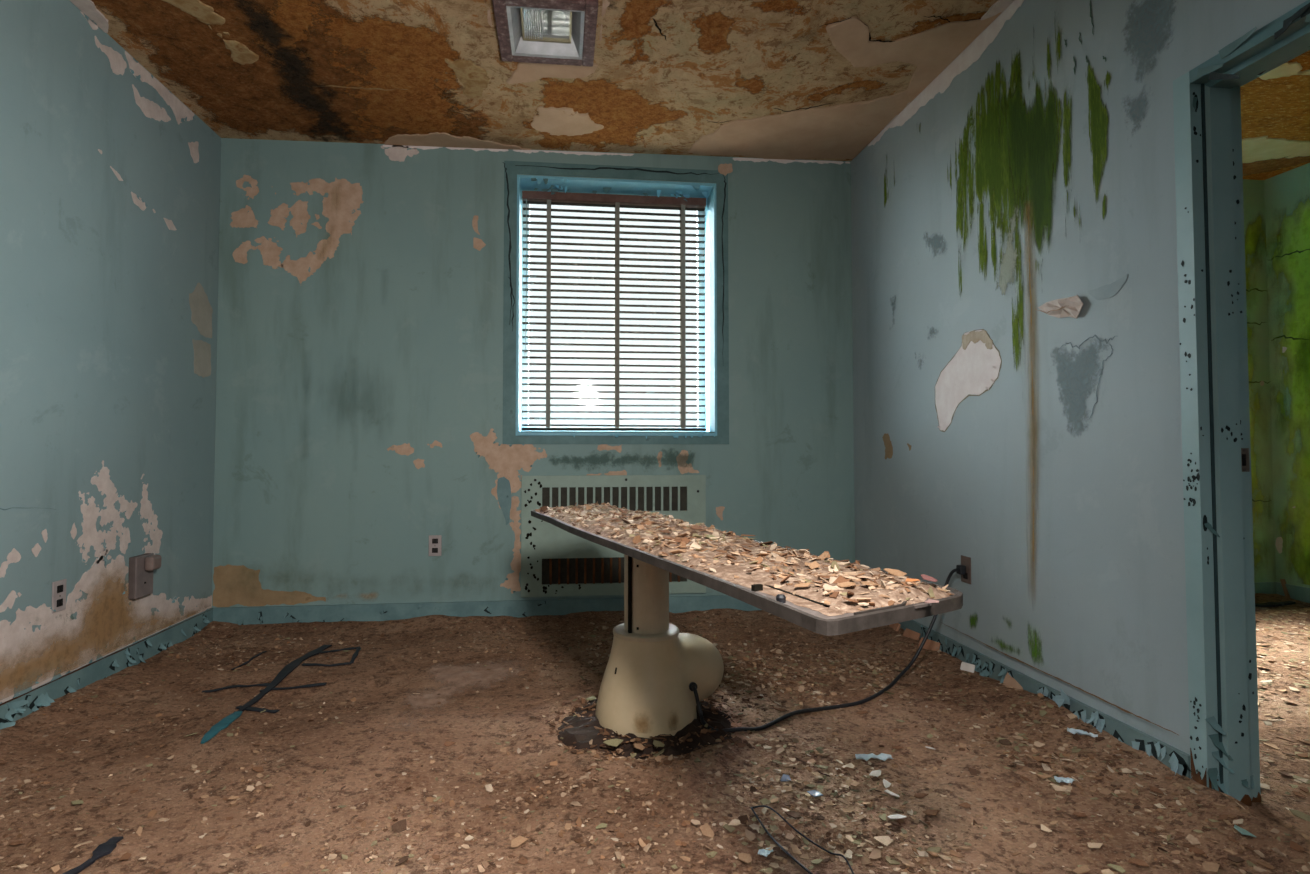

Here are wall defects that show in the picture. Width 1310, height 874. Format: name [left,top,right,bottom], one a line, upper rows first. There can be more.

peeling [70,0,195,125]
peeling [162,0,259,65]
water stain [235,0,353,142]
peeling [495,46,598,84]
peeling [688,0,1024,176]
crack [819,17,894,42]
peeling [1233,136,1310,180]
peeling [230,175,364,284]
water stain [947,26,1062,574]
peeling [935,329,1002,432]
peeling [470,428,581,617]
peeling [0,460,347,729]